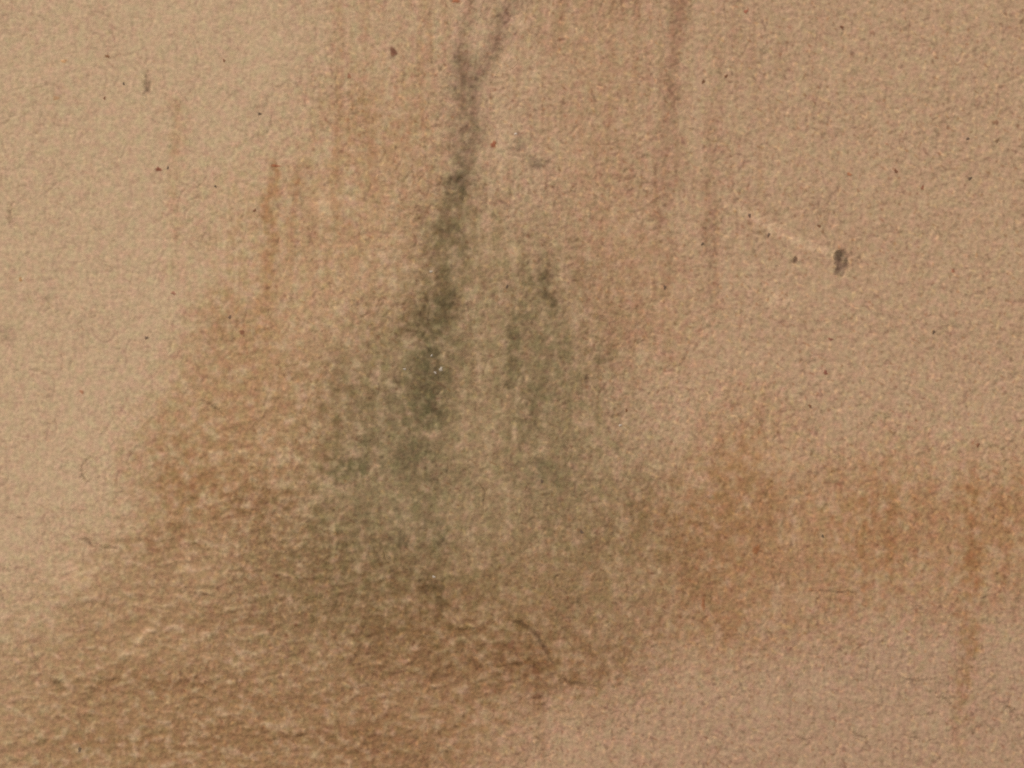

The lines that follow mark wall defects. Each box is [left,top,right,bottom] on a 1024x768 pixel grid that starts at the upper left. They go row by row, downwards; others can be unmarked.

damp [90,0,733,622]
damp [112,598,201,637]
rust [687,363,1024,758]